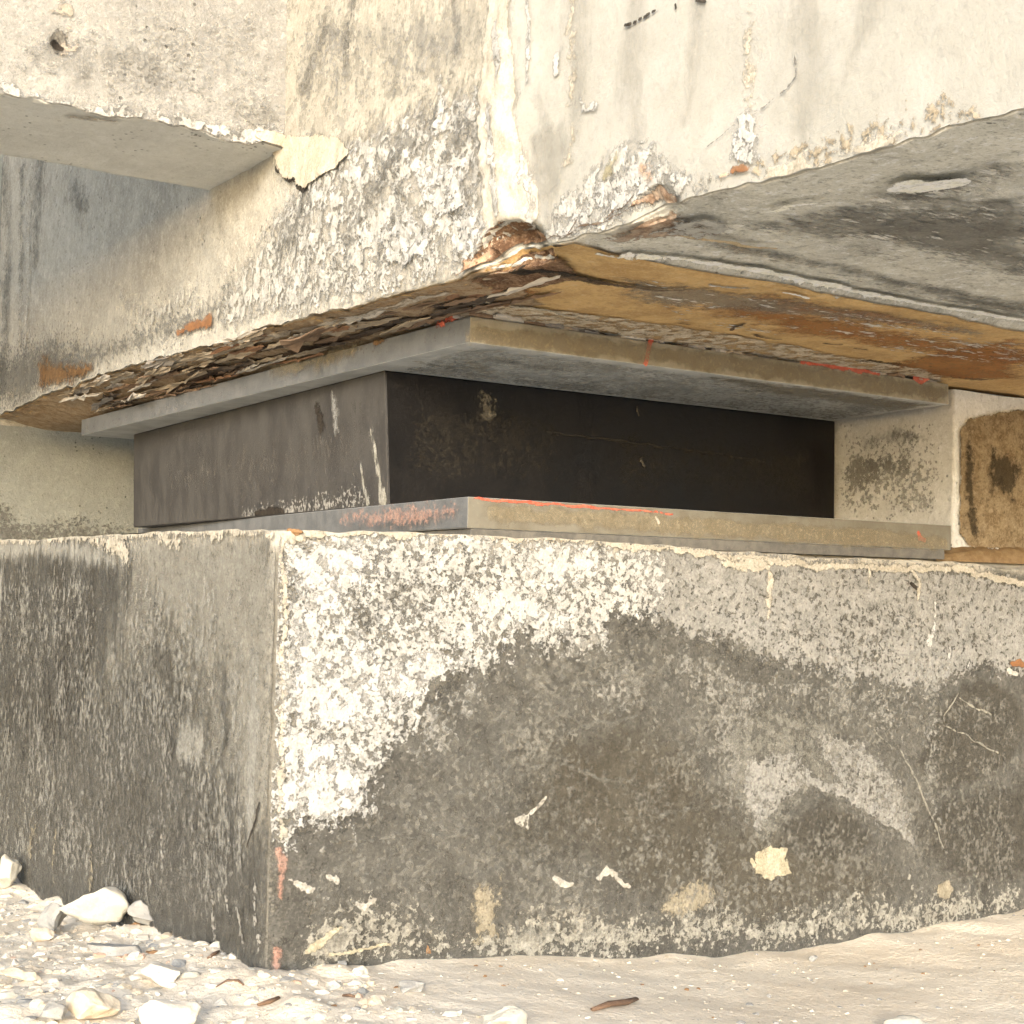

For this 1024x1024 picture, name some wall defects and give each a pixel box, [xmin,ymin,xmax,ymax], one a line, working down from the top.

flaking render [255,129,348,193]
peeling [57,221,681,413]
spalling [595,185,1024,321]
spalling [695,92,980,188]
peeling [887,178,972,194]
corrosion [0,244,1024,550]
water stain [841,425,938,517]
water stain [0,495,1024,971]